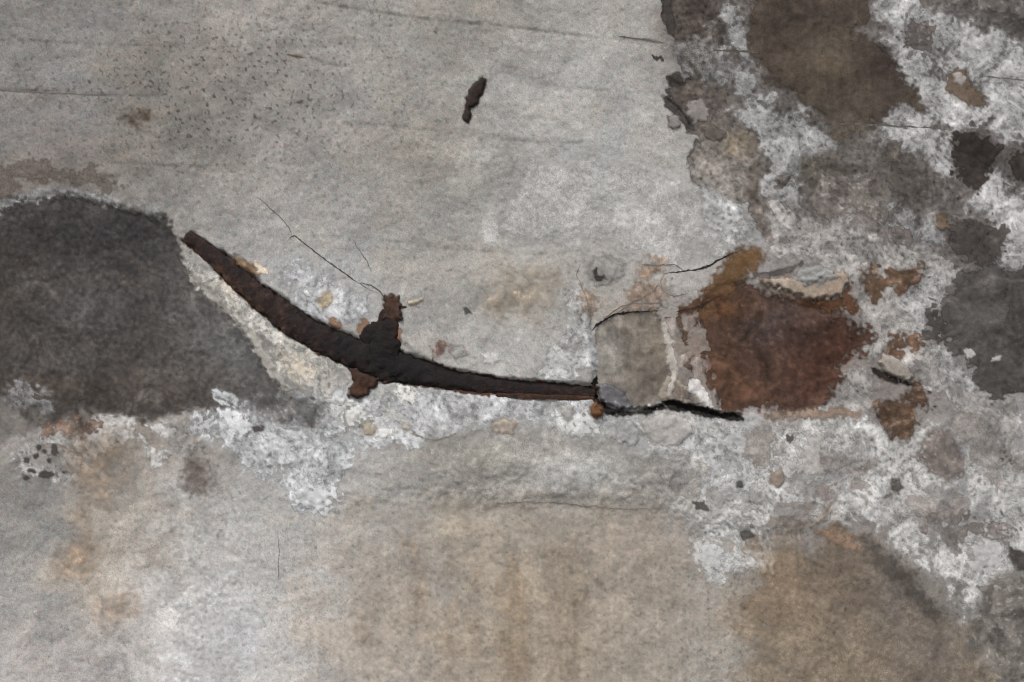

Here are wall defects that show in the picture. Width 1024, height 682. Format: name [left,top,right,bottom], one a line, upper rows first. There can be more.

peeling [661,0,1024,301]
damp [2,380,53,415]
damp [11,248,612,517]
corrosion [180,231,600,400]
crack [576,249,742,329]
crack [589,376,744,421]
flaking render [769,468,786,488]
corrosion [624,245,936,443]
damp [635,0,1024,682]
peeling [872,353,914,385]